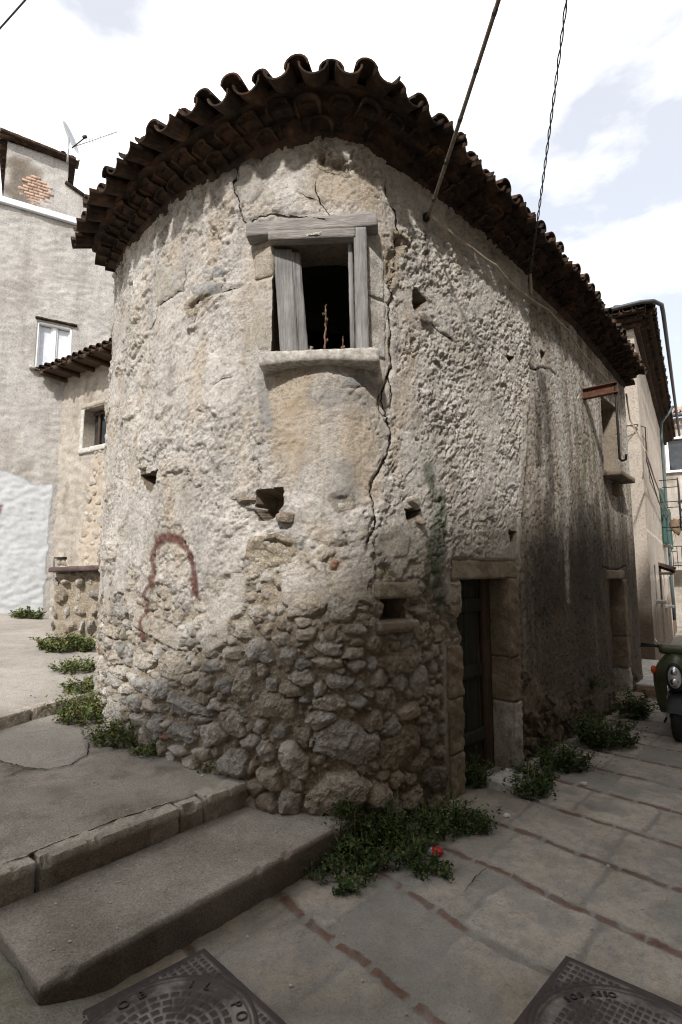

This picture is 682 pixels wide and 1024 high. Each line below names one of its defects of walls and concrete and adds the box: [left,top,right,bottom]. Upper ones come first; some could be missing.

spalling [18,175,54,206]
crack [232,170,329,223]
crack [352,181,412,551]
spalling [78,449,462,831]
spalling [520,666,643,762]